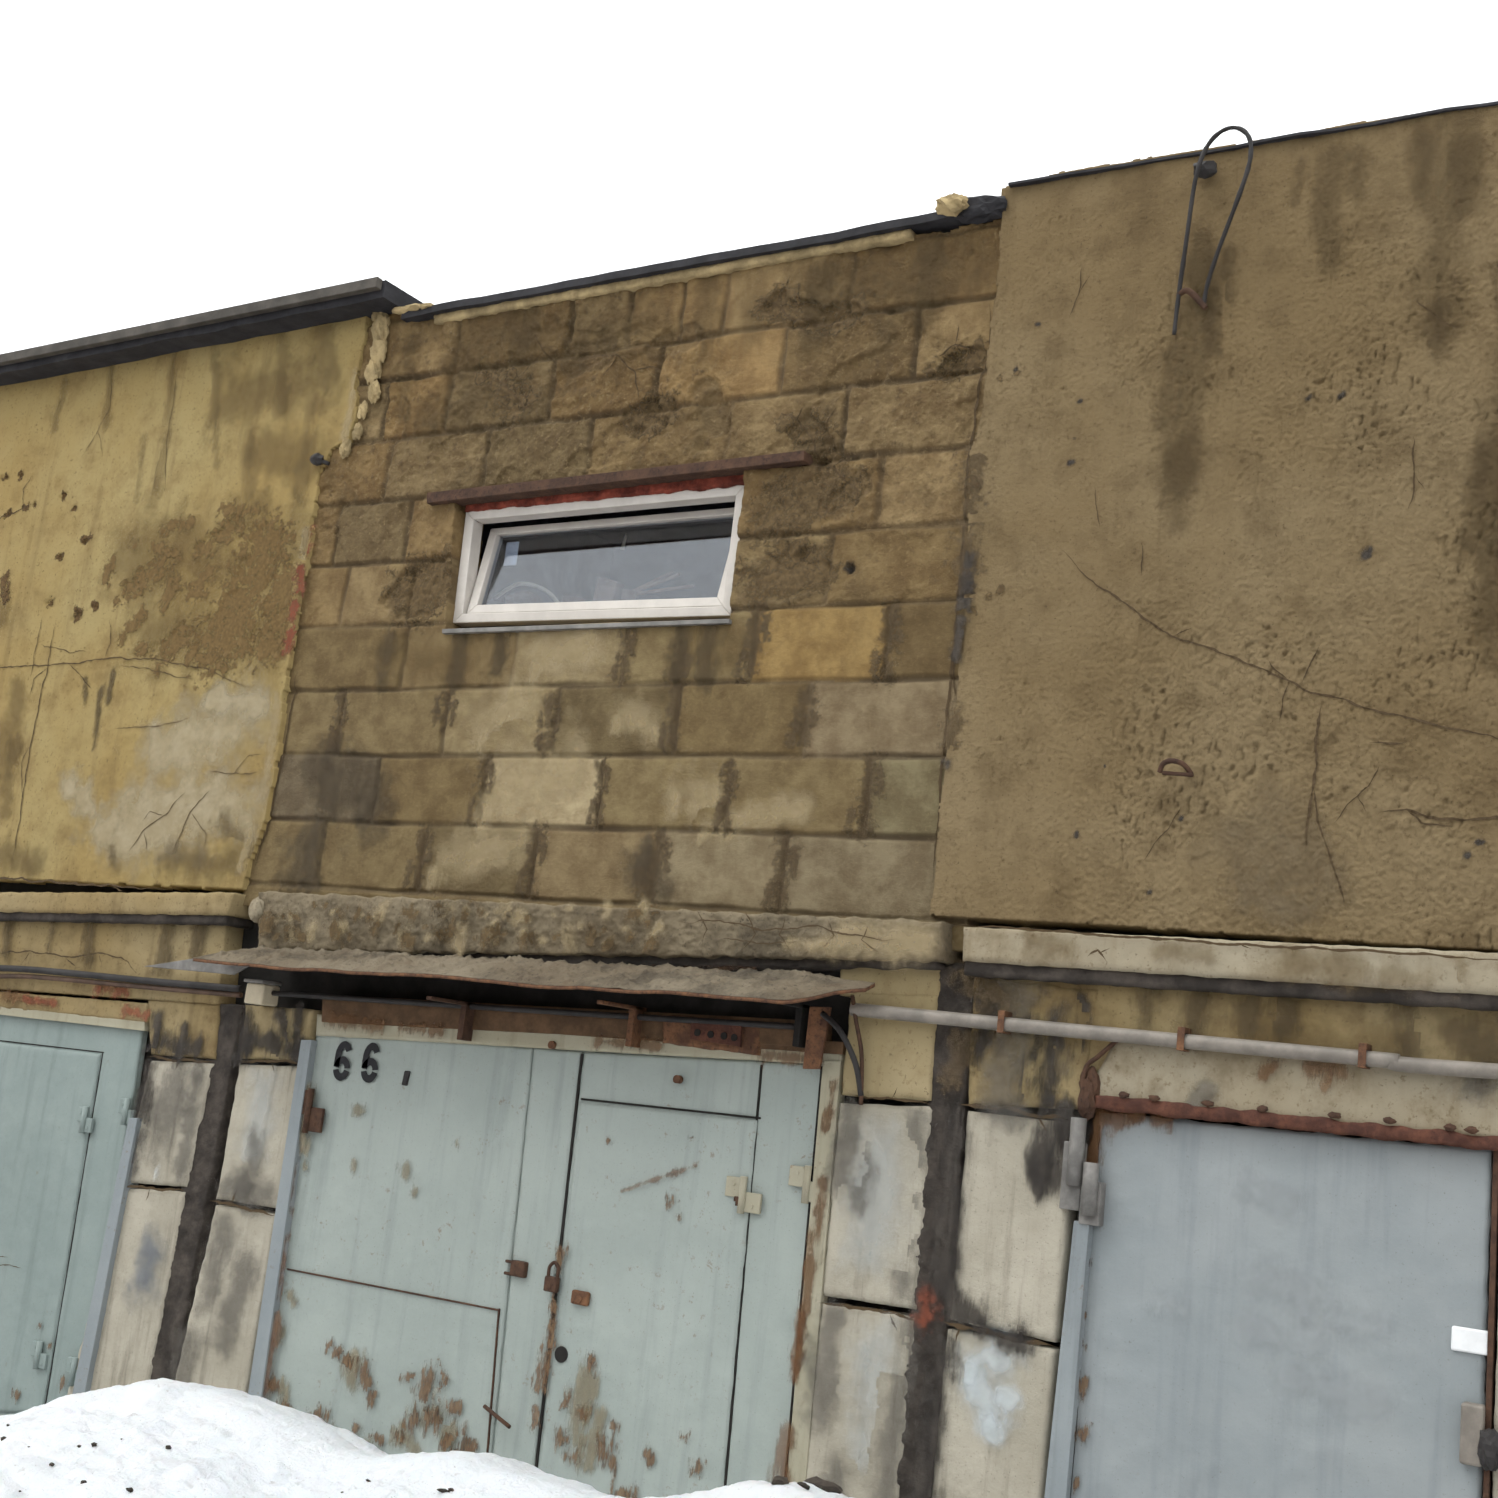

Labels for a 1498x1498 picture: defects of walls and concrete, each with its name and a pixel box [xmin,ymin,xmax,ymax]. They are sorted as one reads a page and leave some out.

peeling [73,495,315,692]
crack [0,620,297,891]
crack [1062,543,1498,899]
corrosion [310,1401,334,1426]
corrosion [325,1339,478,1452]
corrosion [554,1245,569,1270]
corrosion [531,1293,638,1498]
corrosion [643,1447,655,1467]
corrosion [680,1431,707,1480]
leakage [908,1102,1033,1498]